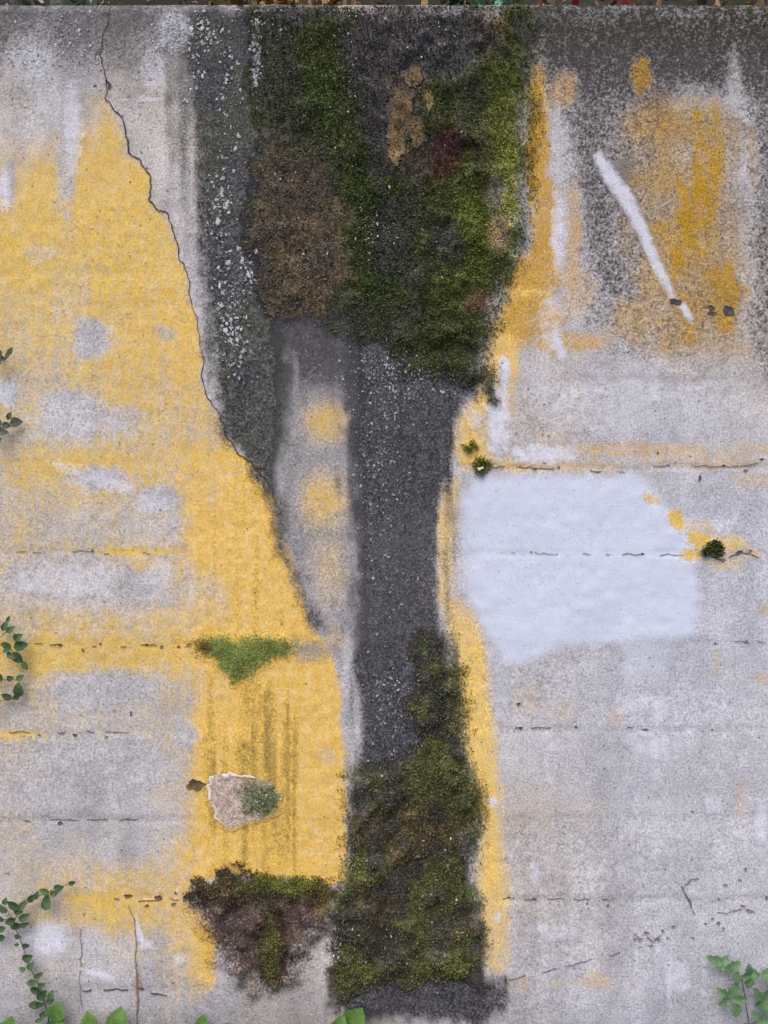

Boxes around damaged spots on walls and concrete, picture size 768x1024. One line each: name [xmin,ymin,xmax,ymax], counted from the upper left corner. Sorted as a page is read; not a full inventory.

crack [95,9,276,503]
leakage [292,348,300,430]
peeling [0,83,350,1010]
leakage [240,485,345,669]
leakage [203,669,300,881]